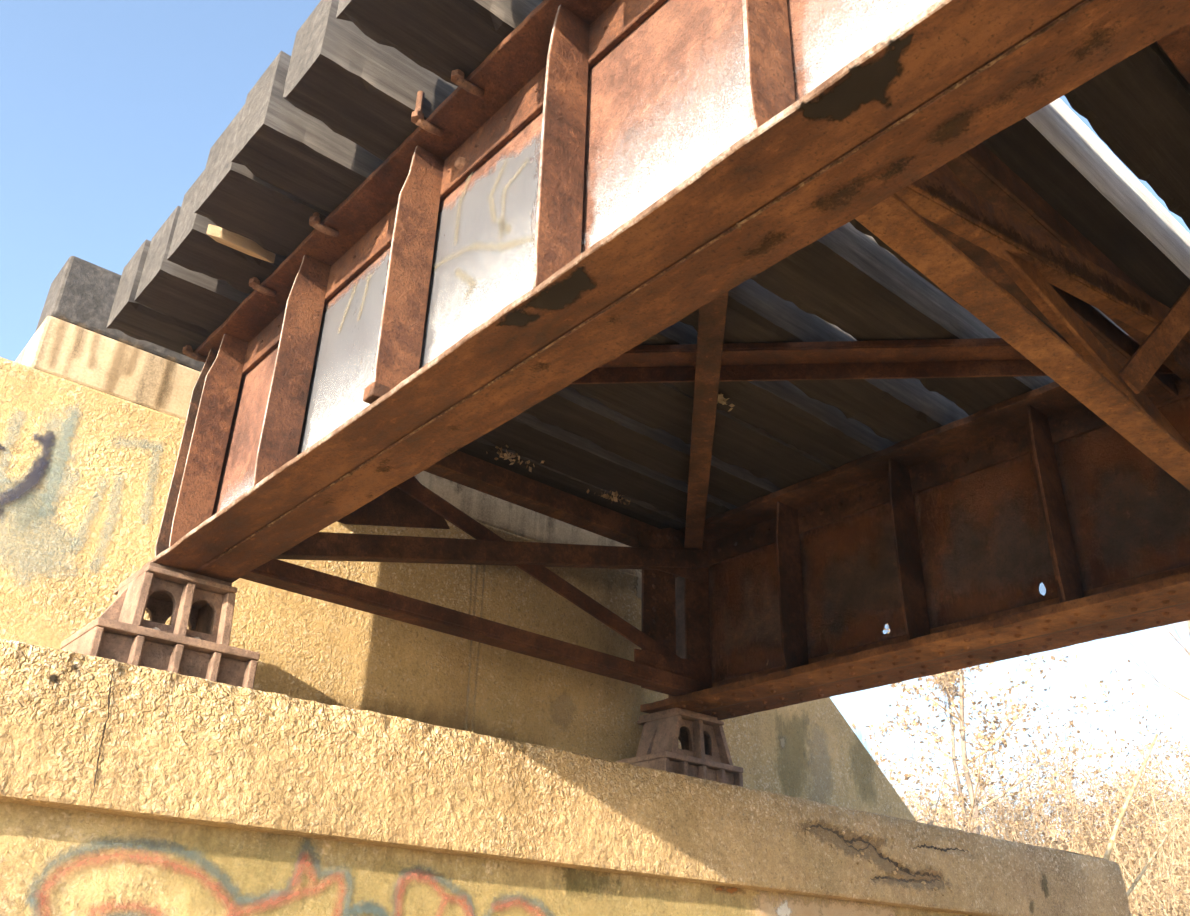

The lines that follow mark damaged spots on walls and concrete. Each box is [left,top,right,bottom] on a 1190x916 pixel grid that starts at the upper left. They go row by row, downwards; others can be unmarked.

peeling [419,134,541,369]
crack [90,663,114,800]
crack [810,824,967,884]